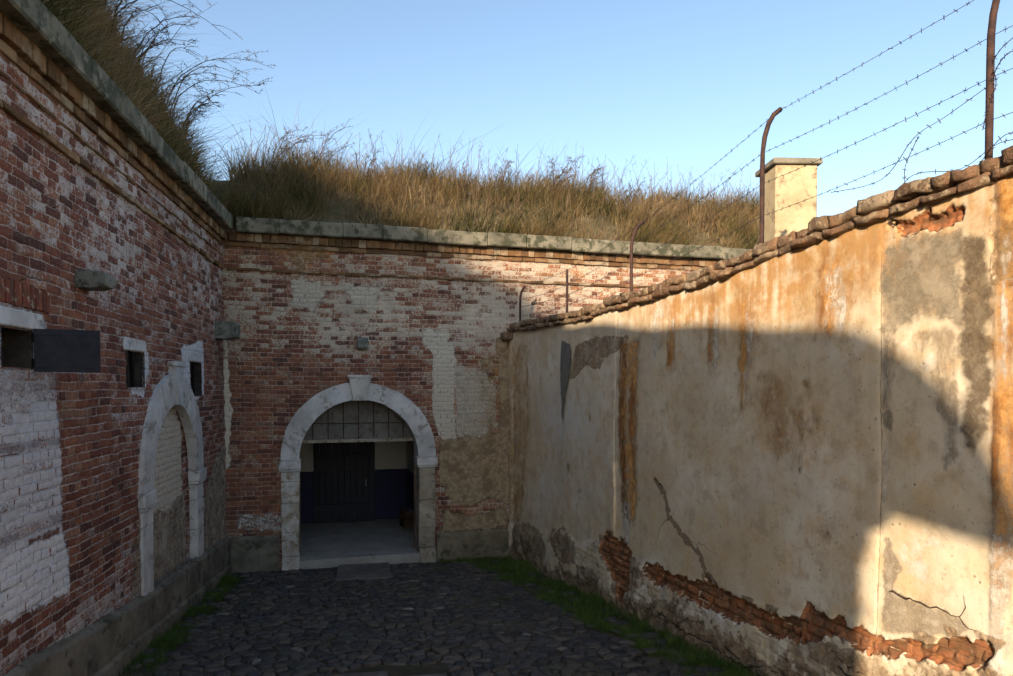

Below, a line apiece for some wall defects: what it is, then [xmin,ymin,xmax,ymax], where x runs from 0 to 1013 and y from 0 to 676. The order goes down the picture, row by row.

spalling [897,205,965,237]
corrosion [618,341,638,543]
leakage [883,331,894,429]
leakage [937,367,958,459]
corrosion [988,177,1013,647]
spalling [512,523,632,605]
crack [654,478,717,585]
spalling [642,562,1006,676]